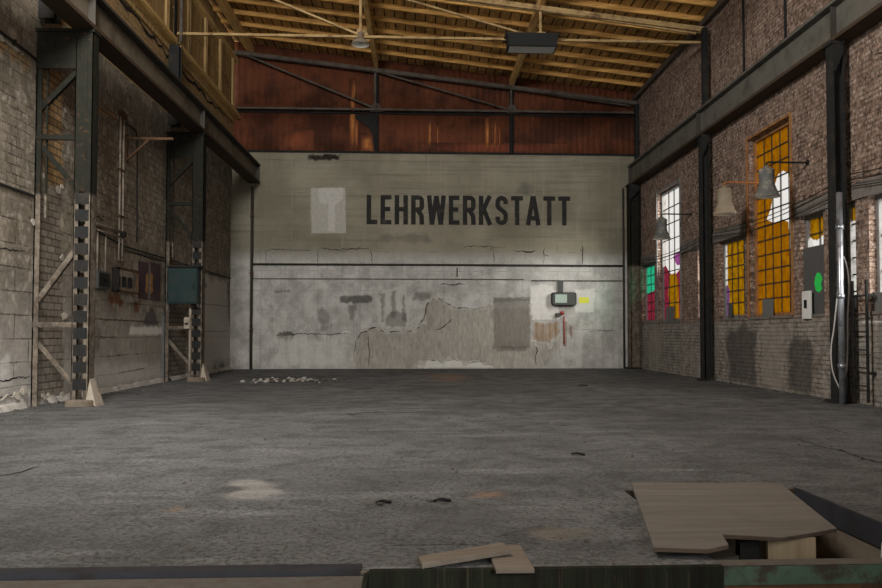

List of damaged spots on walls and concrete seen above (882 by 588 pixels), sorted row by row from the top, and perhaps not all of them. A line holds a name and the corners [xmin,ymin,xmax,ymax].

flaking render [348,297,564,369]
damp [723,313,761,387]
damp [782,328,819,397]